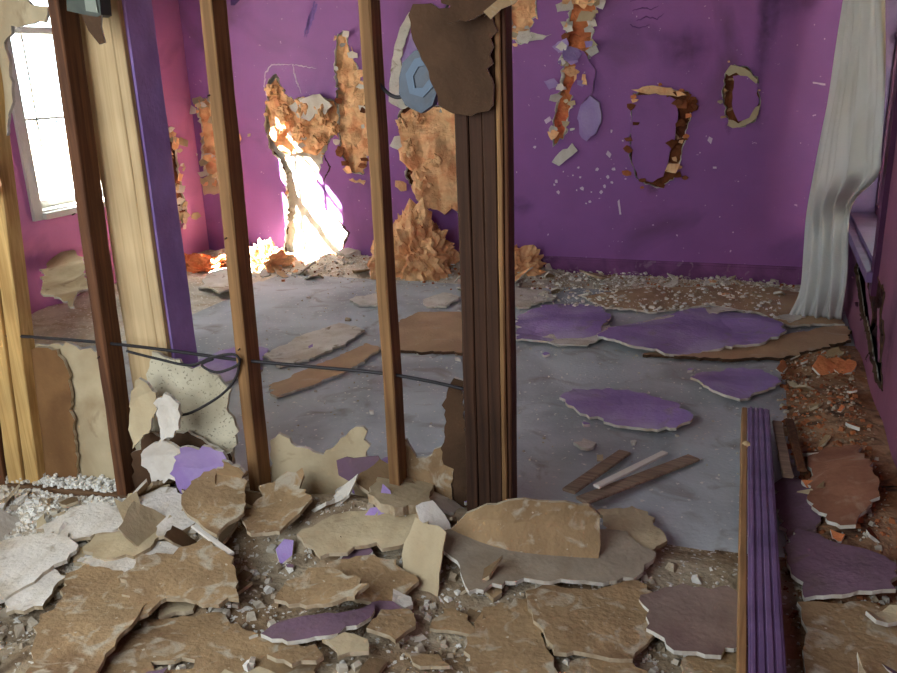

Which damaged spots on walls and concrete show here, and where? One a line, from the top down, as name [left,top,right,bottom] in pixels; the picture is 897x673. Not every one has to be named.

spalling [168,96,219,229]
spalling [263,30,369,254]
spalling [390,105,458,215]
spalling [512,0,698,204]
spalling [717,61,761,128]